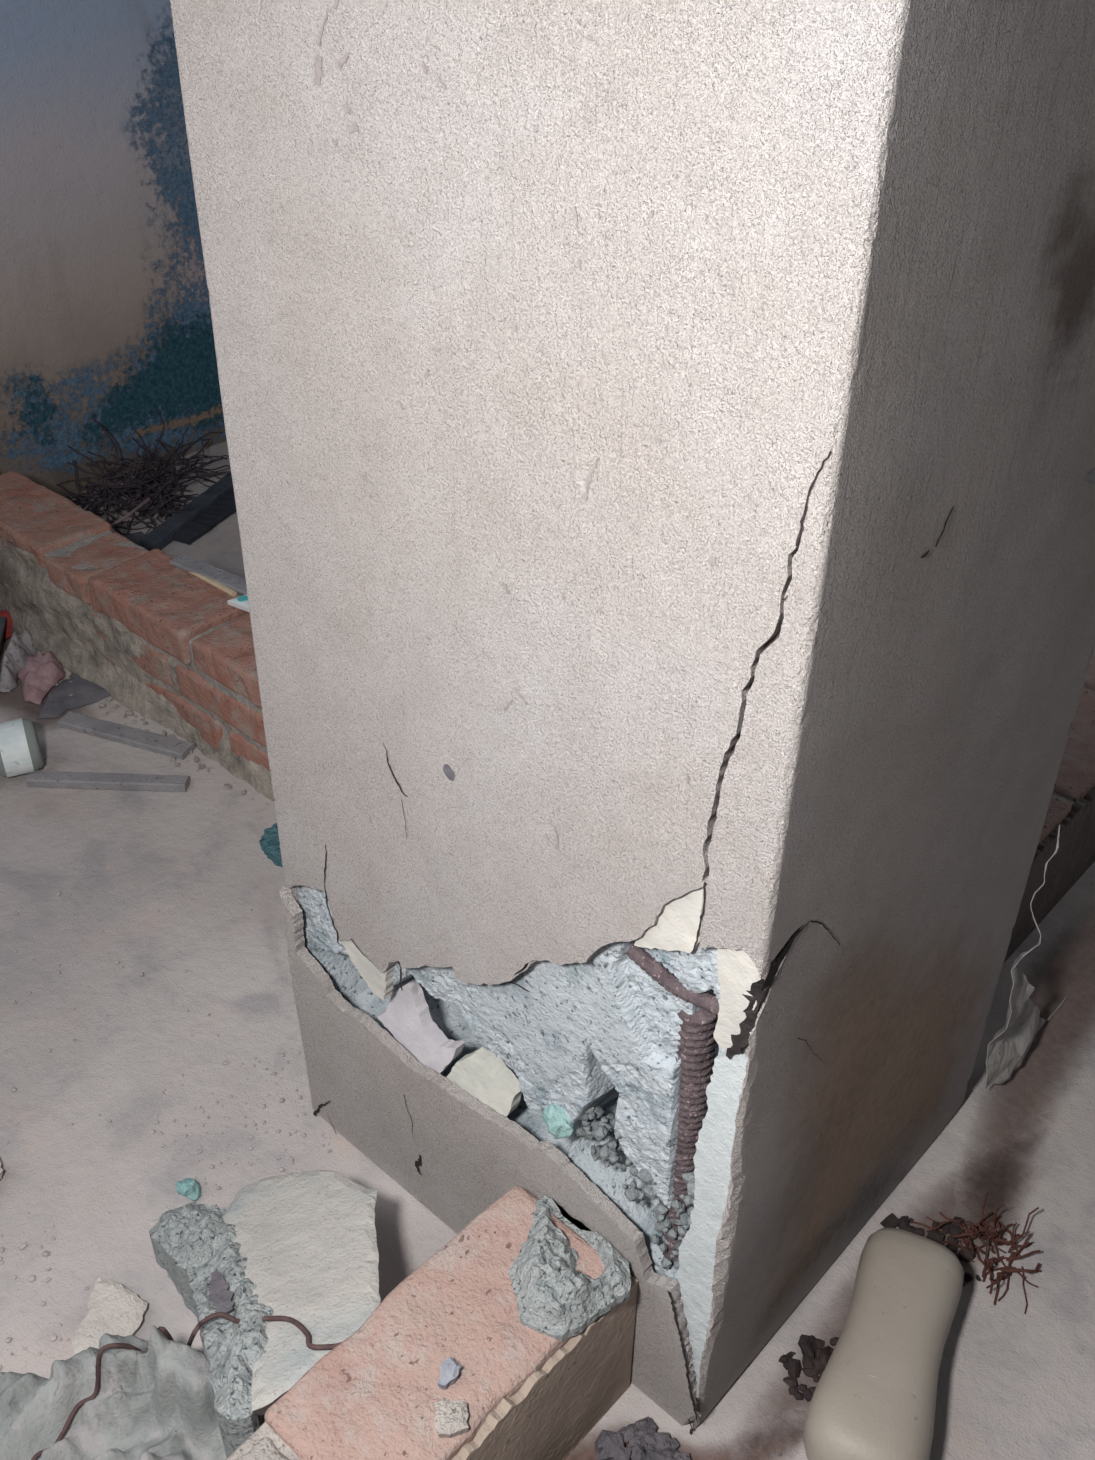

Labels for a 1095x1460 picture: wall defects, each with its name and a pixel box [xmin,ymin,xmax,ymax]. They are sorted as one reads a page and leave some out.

peeling [156,82,191,186]
peeling [171,238,209,302]
peeling [136,404,223,439]
crack [795,451,831,553]
crack [749,595,788,690]
crack [710,733,741,842]
crack [693,882,707,952]
spalling [297,885,776,1398]
spalling [433,1356,469,1438]